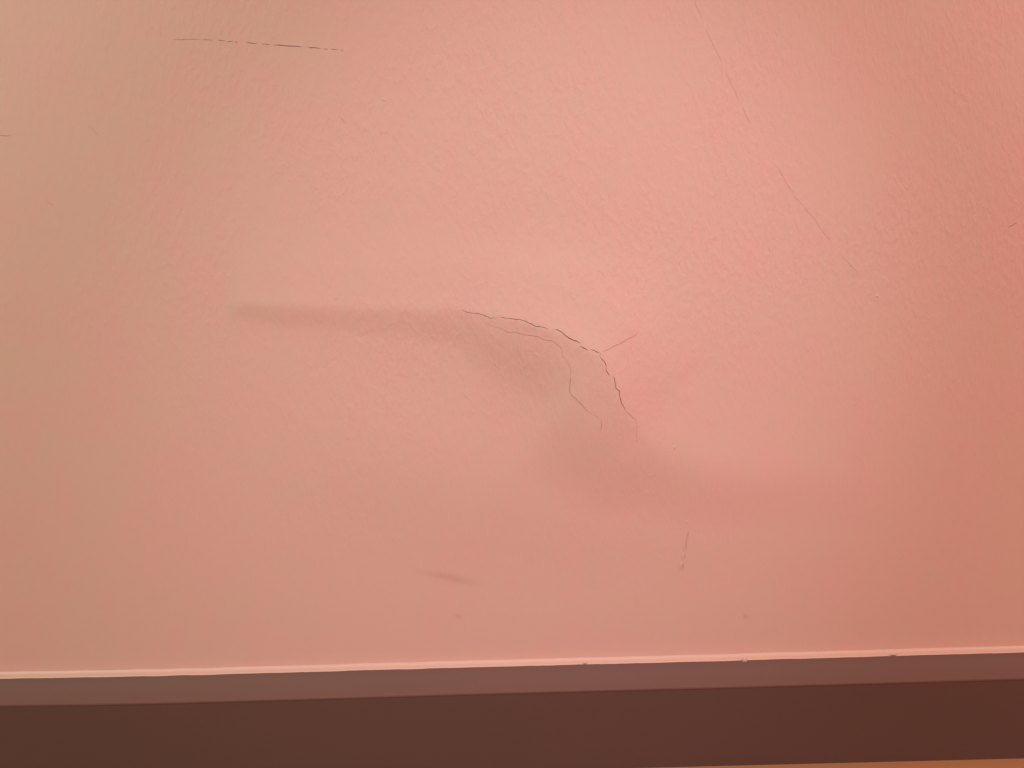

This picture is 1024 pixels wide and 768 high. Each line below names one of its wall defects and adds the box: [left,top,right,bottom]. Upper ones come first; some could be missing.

crack [463,310,632,427]